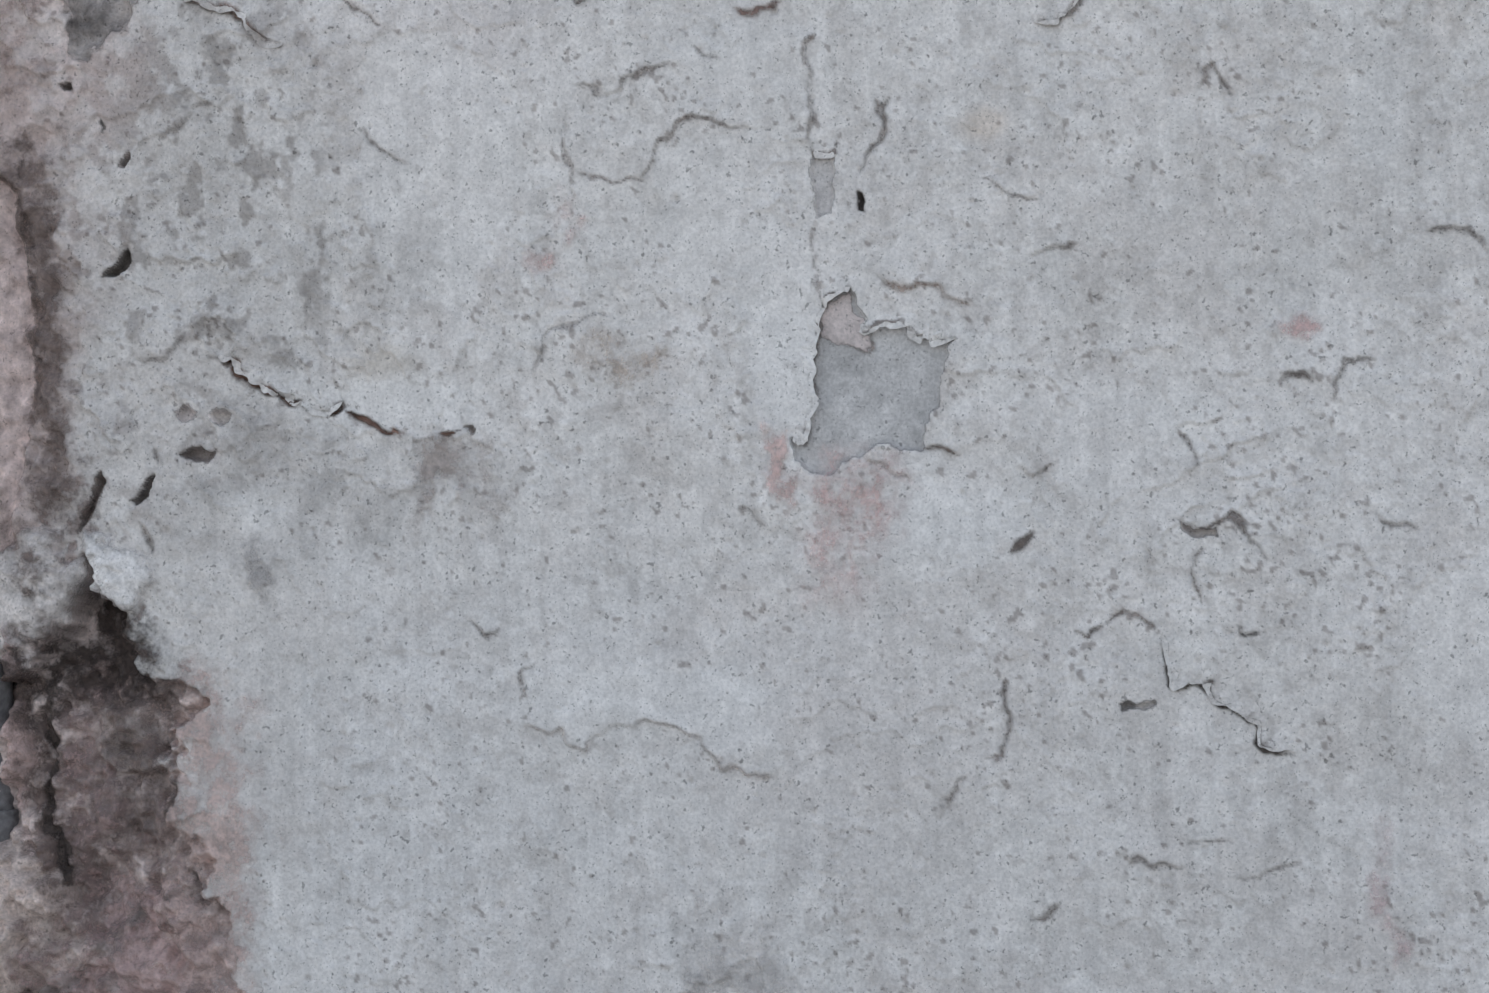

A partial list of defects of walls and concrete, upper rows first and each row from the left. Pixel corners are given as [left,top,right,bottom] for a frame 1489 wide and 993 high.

spalling [64,0,138,61]
spalling [118,152,131,168]
crack [869,101,886,151]
spalling [102,249,132,277]
flaking render [0,180,41,554]
spalling [179,446,216,463]
spalling [175,404,231,426]
crack [214,346,399,435]
flaking render [790,266,958,476]
crack [1193,511,1248,597]
flaking render [0,470,246,993]
crack [1162,629,1300,755]